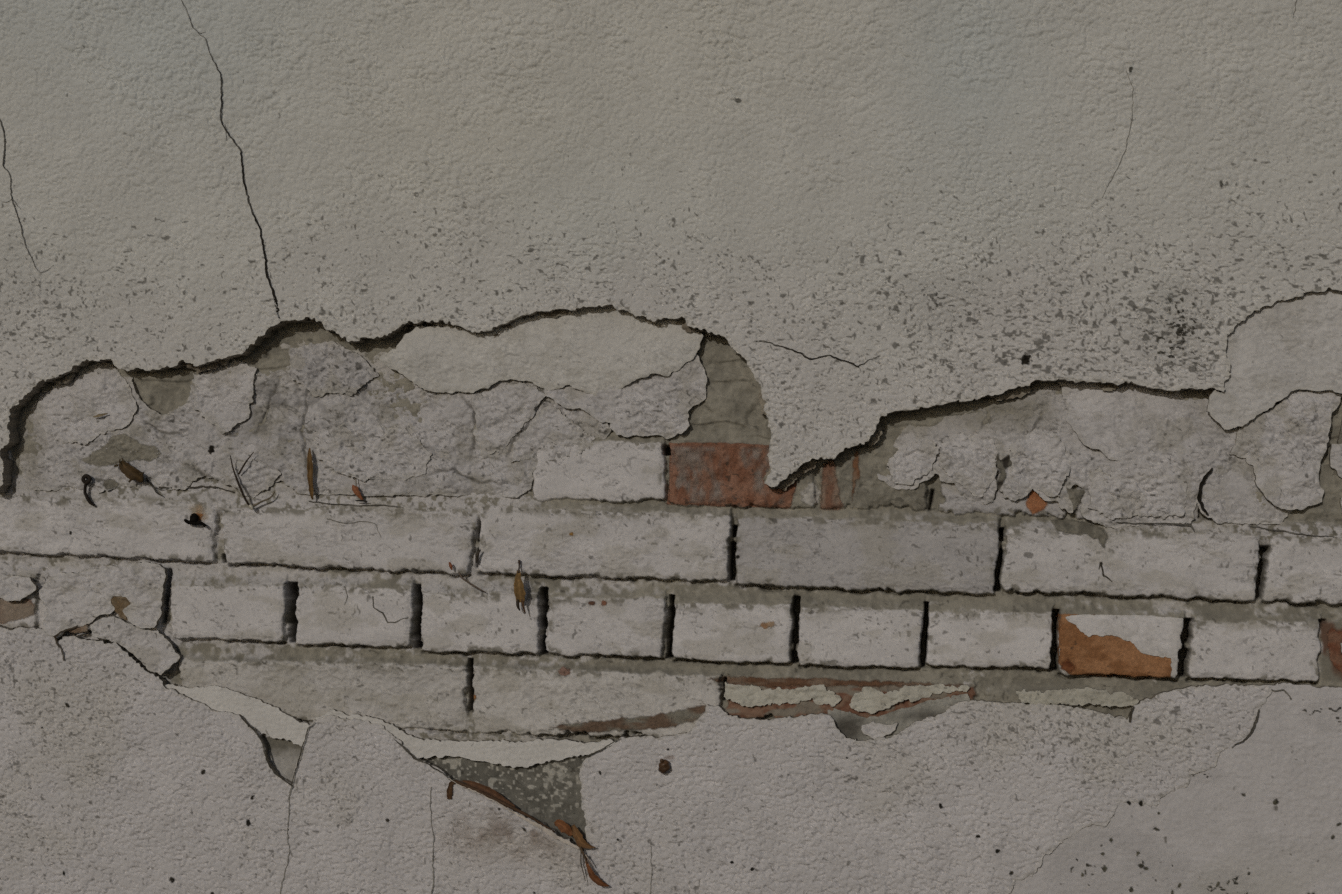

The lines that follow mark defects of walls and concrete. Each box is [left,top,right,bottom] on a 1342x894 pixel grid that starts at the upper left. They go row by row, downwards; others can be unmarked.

crack [0,120,50,273]
crack [181,0,282,324]
spalling [19,306,860,510]
spalling [877,288,1342,548]
peeling [0,561,182,675]
flaking render [1057,613,1184,678]
spalling [264,735,303,782]
peeling [554,705,706,733]
peeling [713,676,970,740]